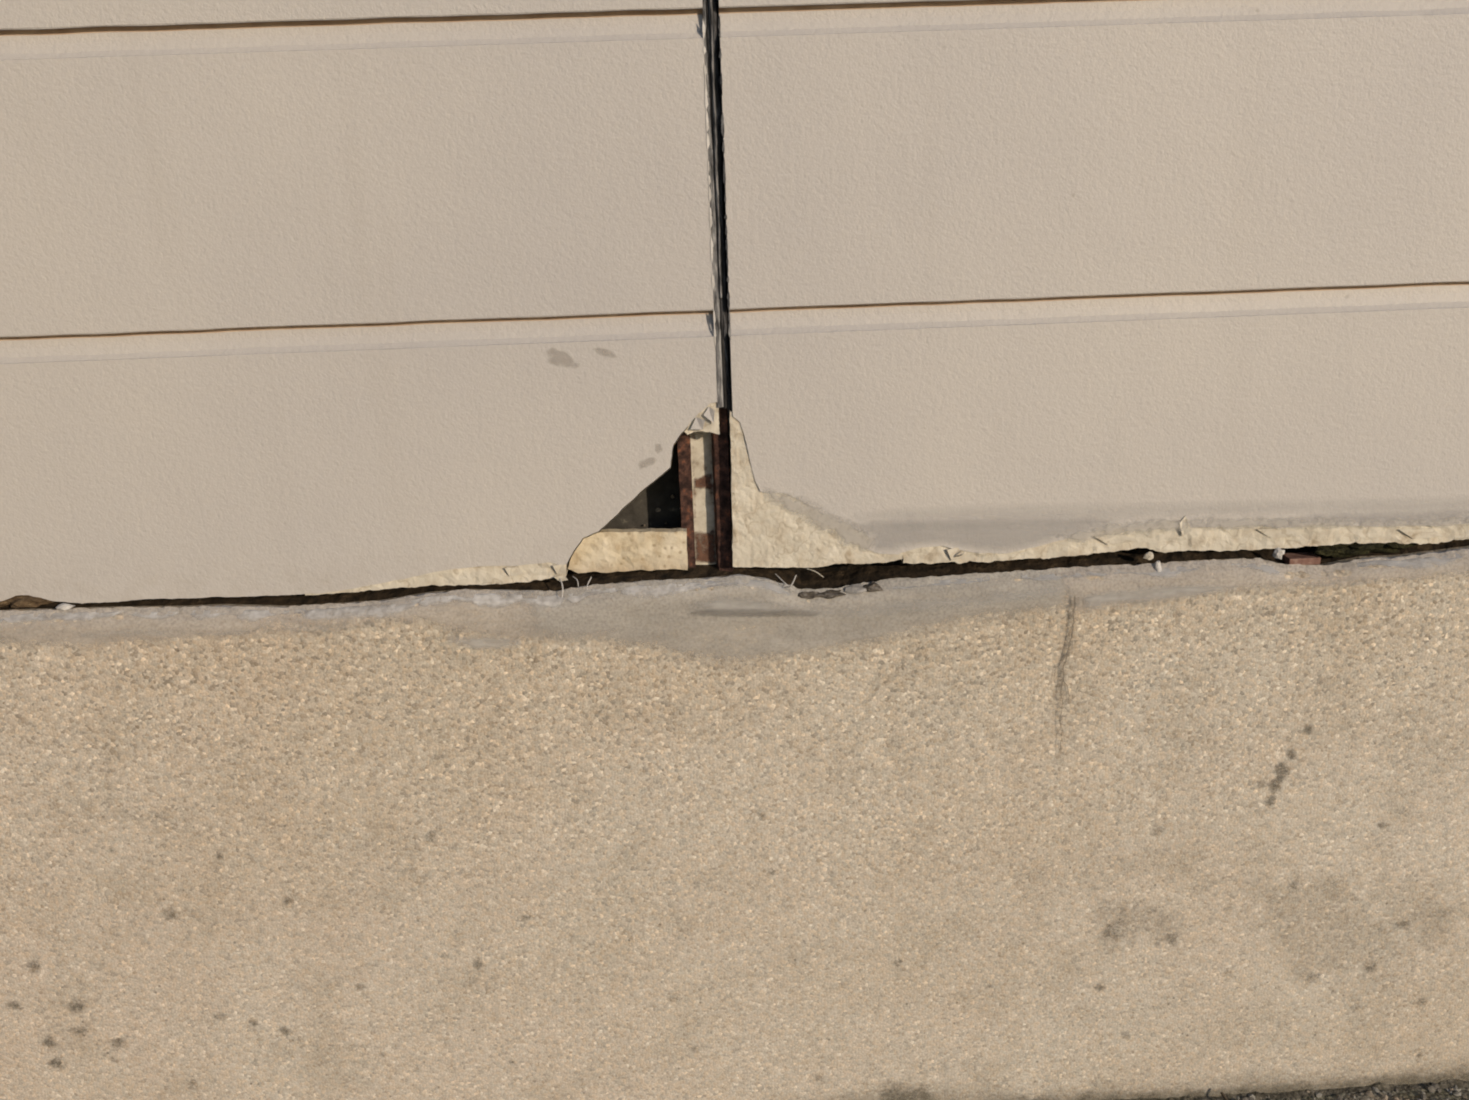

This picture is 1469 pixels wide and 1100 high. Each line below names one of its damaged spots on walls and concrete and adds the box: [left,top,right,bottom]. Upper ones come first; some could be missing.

rust [695,474,713,494]
peeling [305,402,1469,596]
rust [695,530,716,563]